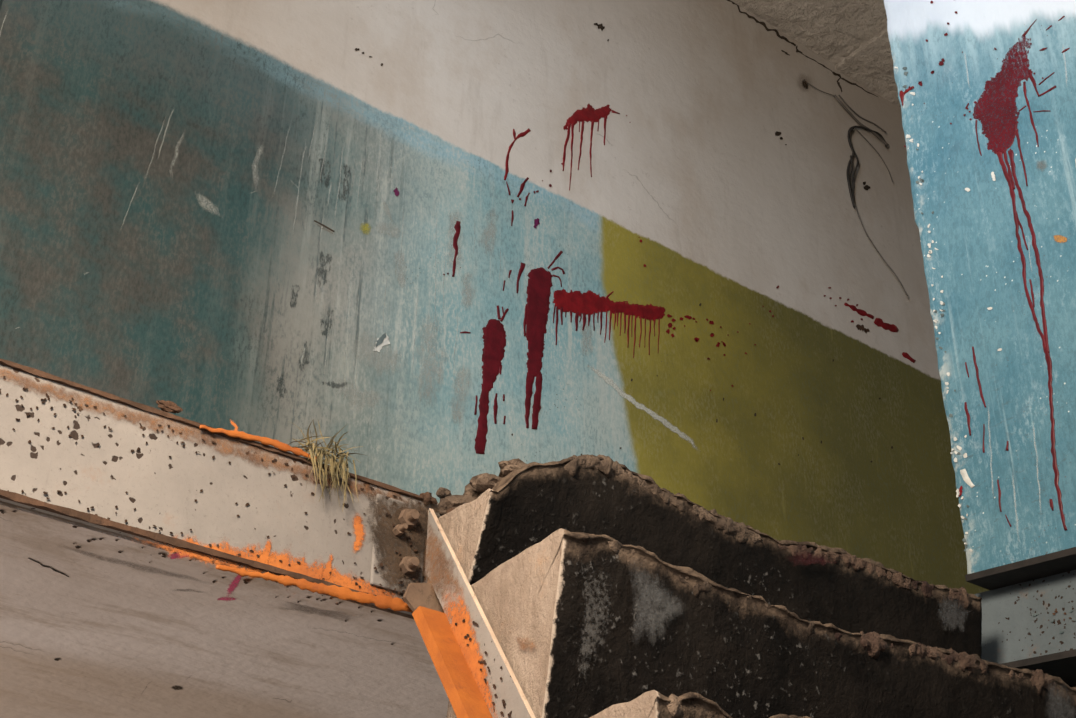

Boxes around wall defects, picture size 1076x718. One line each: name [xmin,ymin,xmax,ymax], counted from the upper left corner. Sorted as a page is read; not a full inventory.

crack [832,72,878,97]
rust [0,369,408,503]
spalling [564,453,763,543]
rust [157,535,413,612]
rust [353,515,365,550]
spalling [608,537,635,555]
spalling [778,542,934,598]
peeling [579,563,611,675]
peeling [635,574,680,634]
spalling [666,694,696,718]